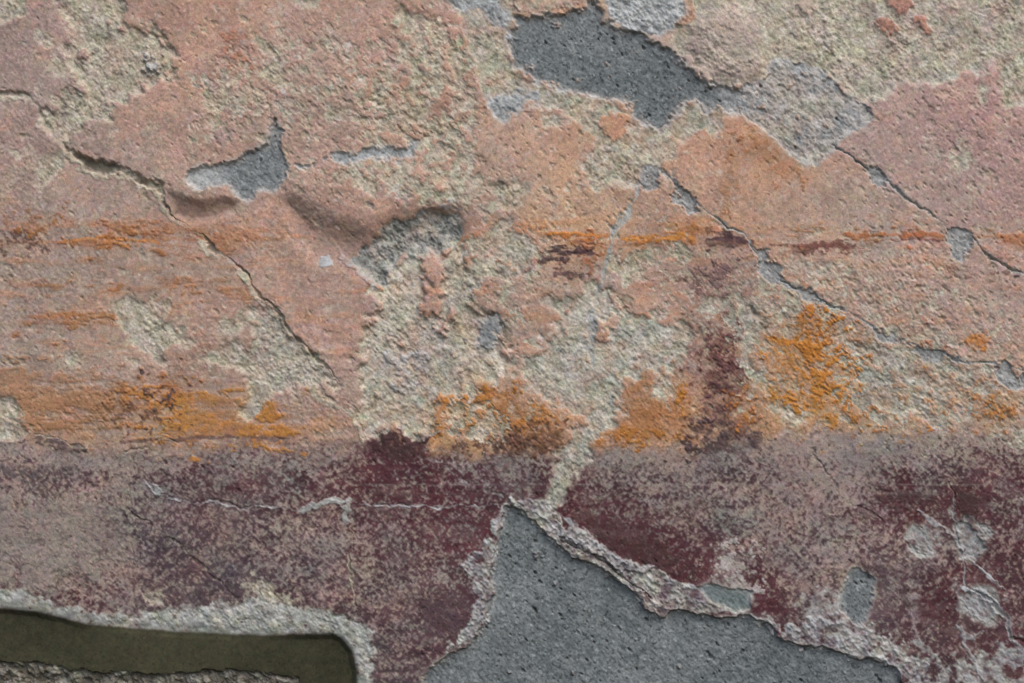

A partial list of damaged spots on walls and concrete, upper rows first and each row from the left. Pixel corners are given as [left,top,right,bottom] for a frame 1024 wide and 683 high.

flaking render [670,0,1024,112]
rust [0,197,309,465]
crack [0,89,367,444]
flaking render [8,0,829,667]
rust [430,380,571,473]
rust [594,368,702,454]
crack [583,165,1024,391]
flaking render [818,321,1024,452]
crack [832,145,1024,276]
spalling [742,586,1024,683]